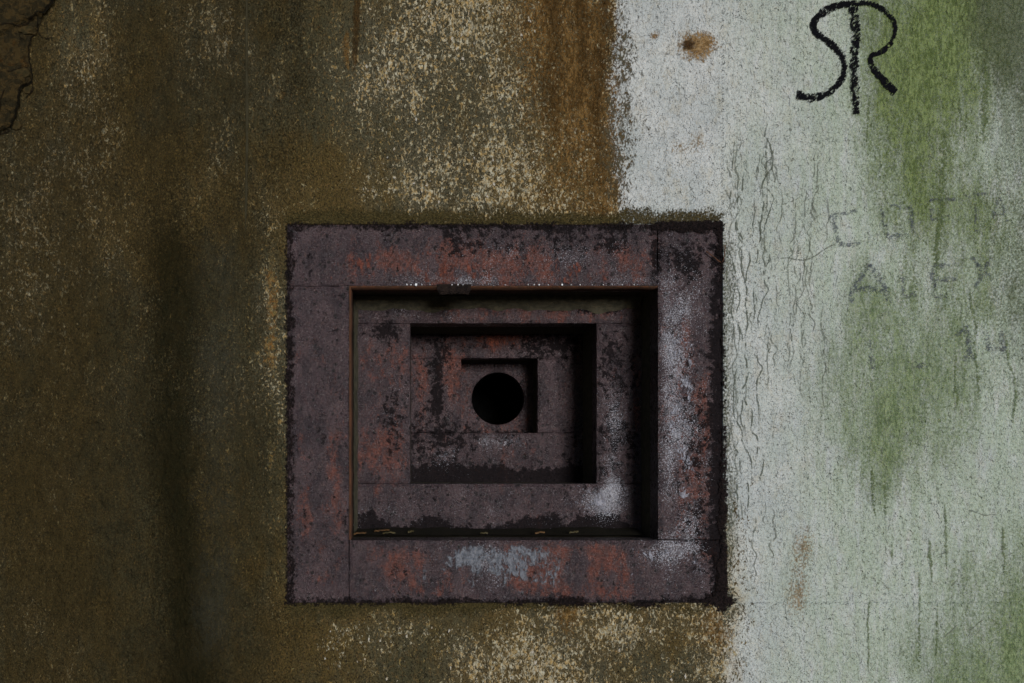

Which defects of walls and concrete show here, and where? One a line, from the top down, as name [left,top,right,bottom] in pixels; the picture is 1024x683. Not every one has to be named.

spalling [0,0,50,131]
corrosion [678,31,718,63]
water stain [965,0,1024,148]
water stain [0,0,280,683]
corrosion [349,286,438,540]
crack [725,124,835,580]